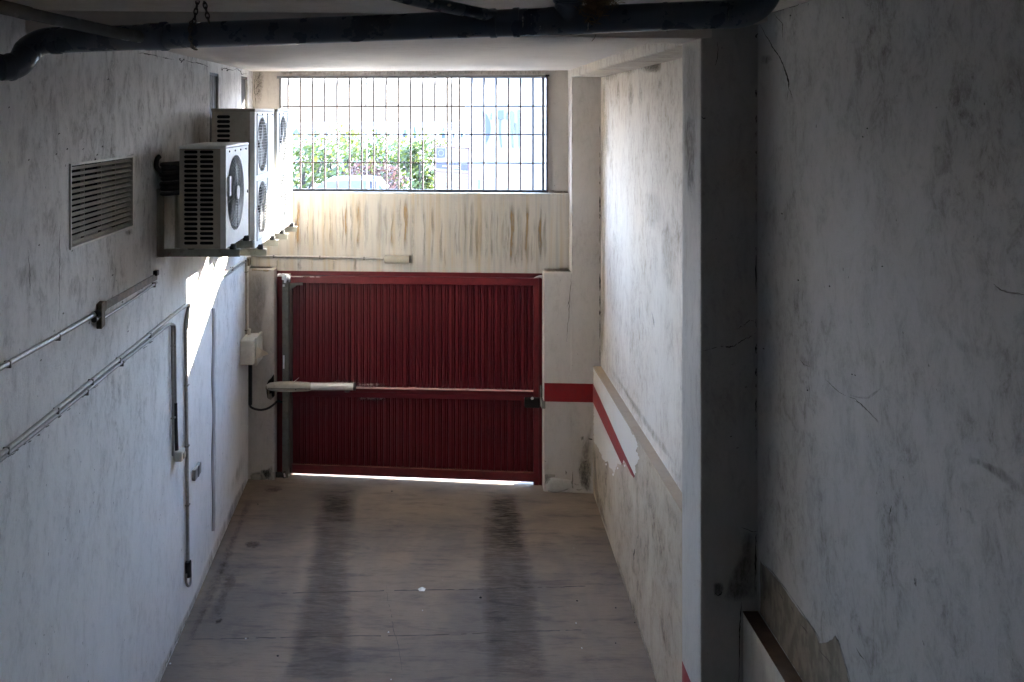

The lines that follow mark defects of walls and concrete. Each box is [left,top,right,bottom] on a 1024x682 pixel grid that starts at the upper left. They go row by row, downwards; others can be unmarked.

crack [755,2,806,97]
corrosion [391,203,408,244]
corrosion [510,211,542,258]
peeling [593,369,639,476]
peeling [760,562,849,682]